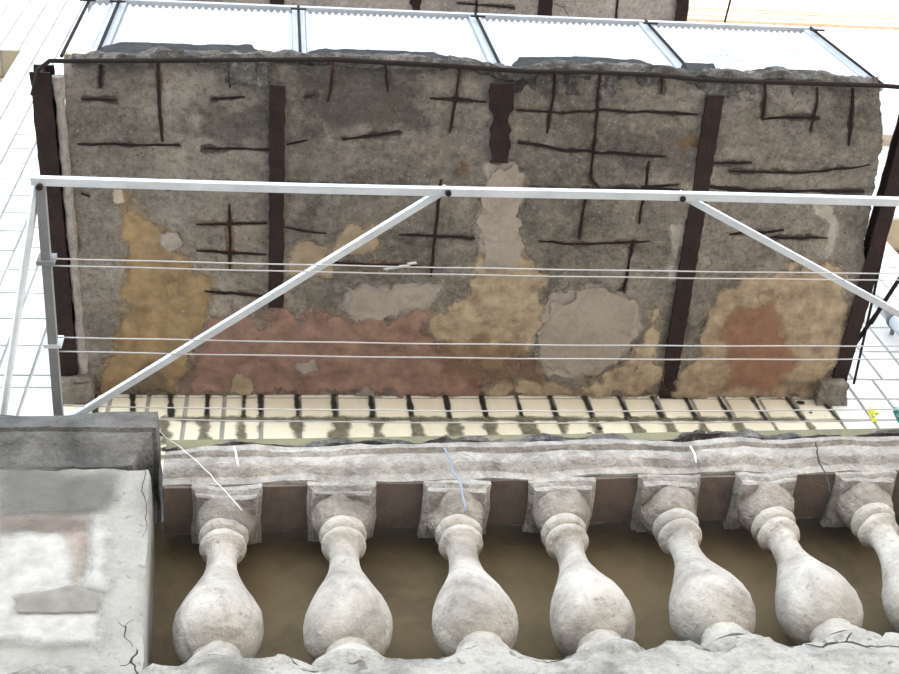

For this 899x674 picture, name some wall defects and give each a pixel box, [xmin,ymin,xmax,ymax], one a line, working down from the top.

spalling [456,0,515,13]
flaking render [30,45,899,400]
damp [159,302,816,459]
crack [118,620,139,674]